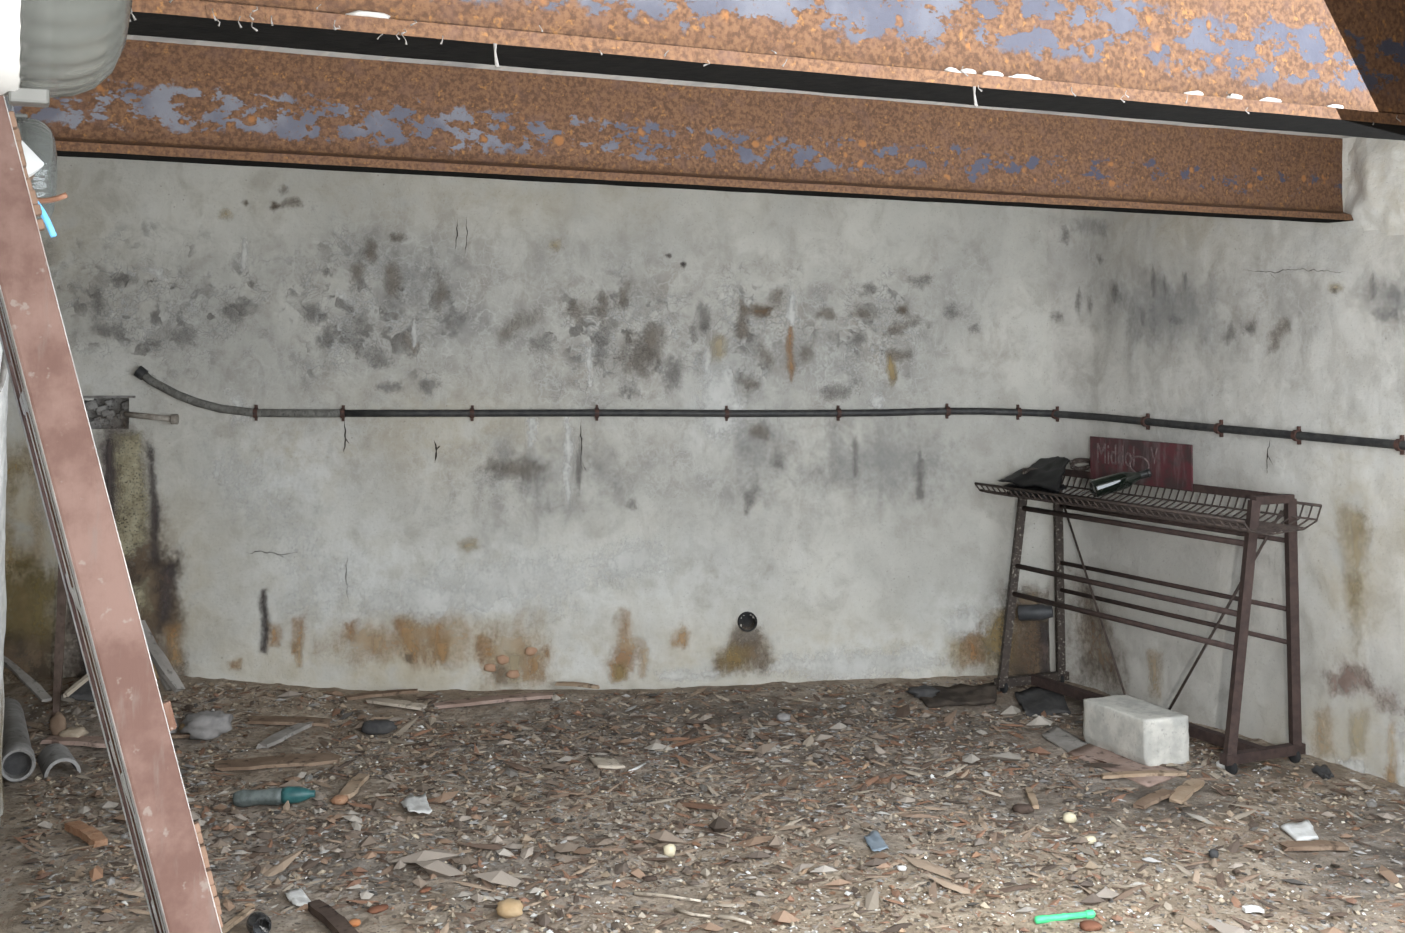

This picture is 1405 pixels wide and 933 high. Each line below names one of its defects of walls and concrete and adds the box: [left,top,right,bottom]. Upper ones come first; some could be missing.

leakage [569,271,812,435]
leakage [818,286,913,396]
leakage [103,431,184,676]
leakage [65,609,87,675]
leakage [260,590,278,652]
leakage [660,629,943,680]
leakage [951,609,984,636]
leakage [1001,587,1050,675]
leakage [1340,760,1364,773]